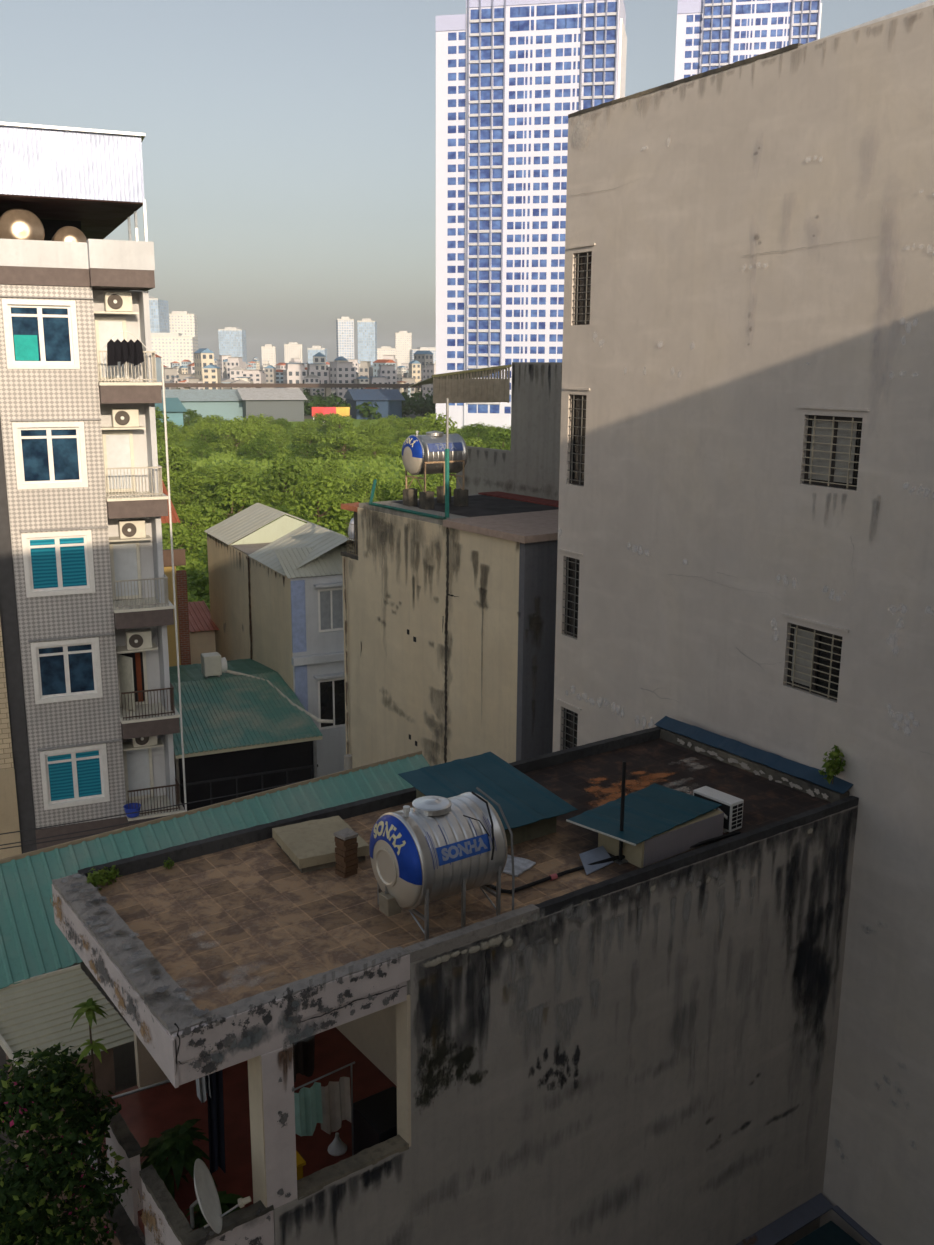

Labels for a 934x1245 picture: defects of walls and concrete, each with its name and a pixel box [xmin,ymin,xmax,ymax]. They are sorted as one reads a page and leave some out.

water stain [472,551,488,603]
peeling [50,874,399,1074]
water stain [416,808,858,1106]